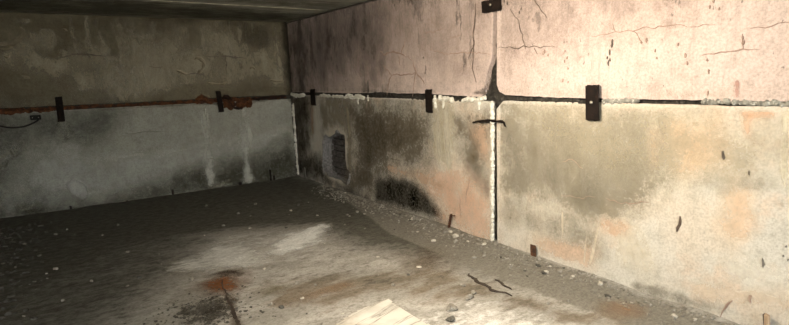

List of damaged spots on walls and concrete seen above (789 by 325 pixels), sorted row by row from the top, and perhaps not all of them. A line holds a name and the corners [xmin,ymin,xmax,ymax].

crack [424,4,554,81]
crack [591,23,715,43]
crack [701,22,789,56]
corrosion [0,94,286,115]
water stain [0,3,490,221]
spalling [322,130,351,185]
water stain [501,104,752,264]
water stain [170,224,330,271]